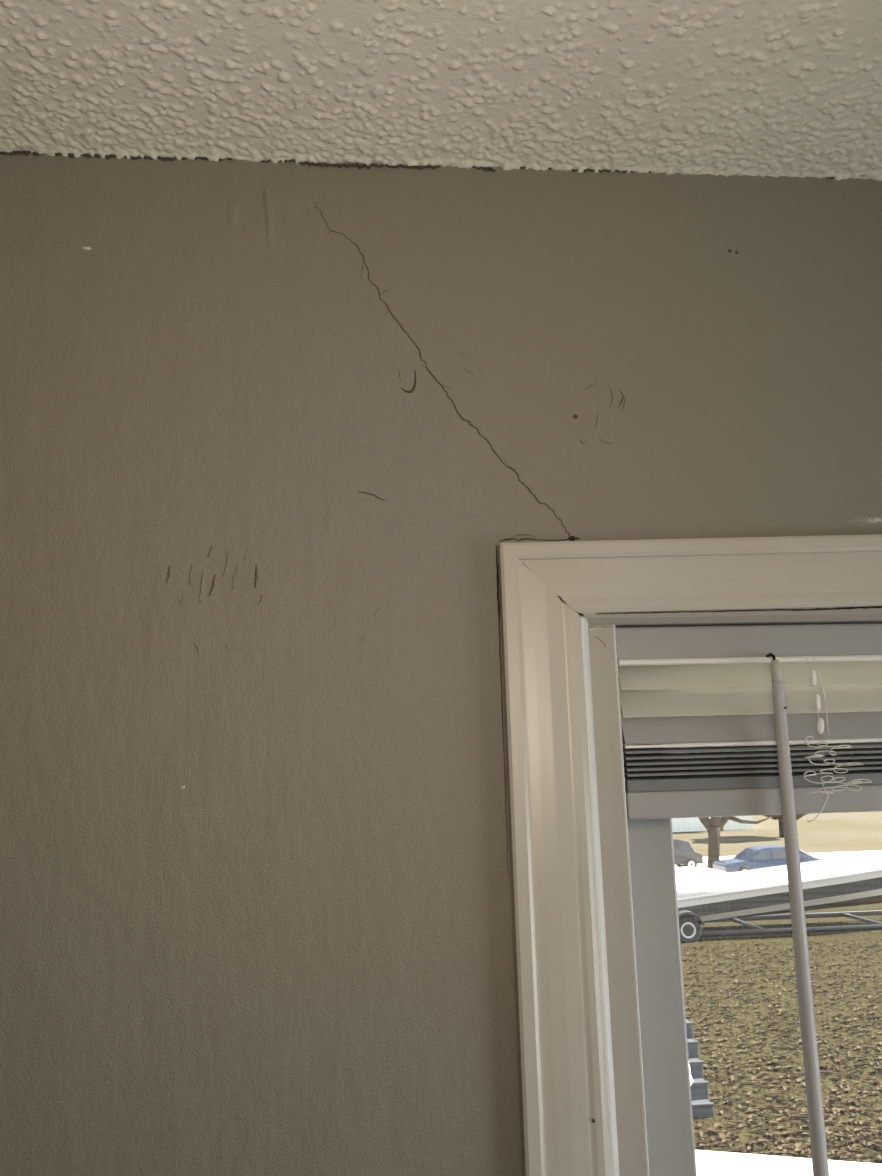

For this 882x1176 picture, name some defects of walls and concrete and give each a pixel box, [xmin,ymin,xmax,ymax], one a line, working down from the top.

crack [314,202,570,865]